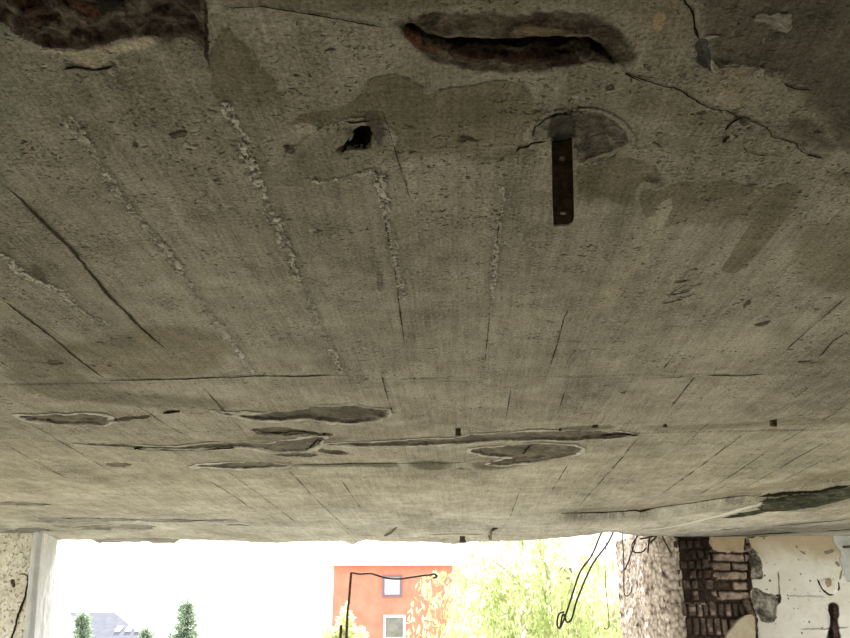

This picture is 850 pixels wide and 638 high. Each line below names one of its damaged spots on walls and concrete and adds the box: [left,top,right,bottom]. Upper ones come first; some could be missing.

spalling [0,0,209,50]
spalling [396,12,636,73]
crack [482,111,589,153]
crack [619,66,827,158]
water stain [568,154,850,326]
peeling [12,413,150,427]
peeling [73,405,640,471]
spalling [673,536,781,638]